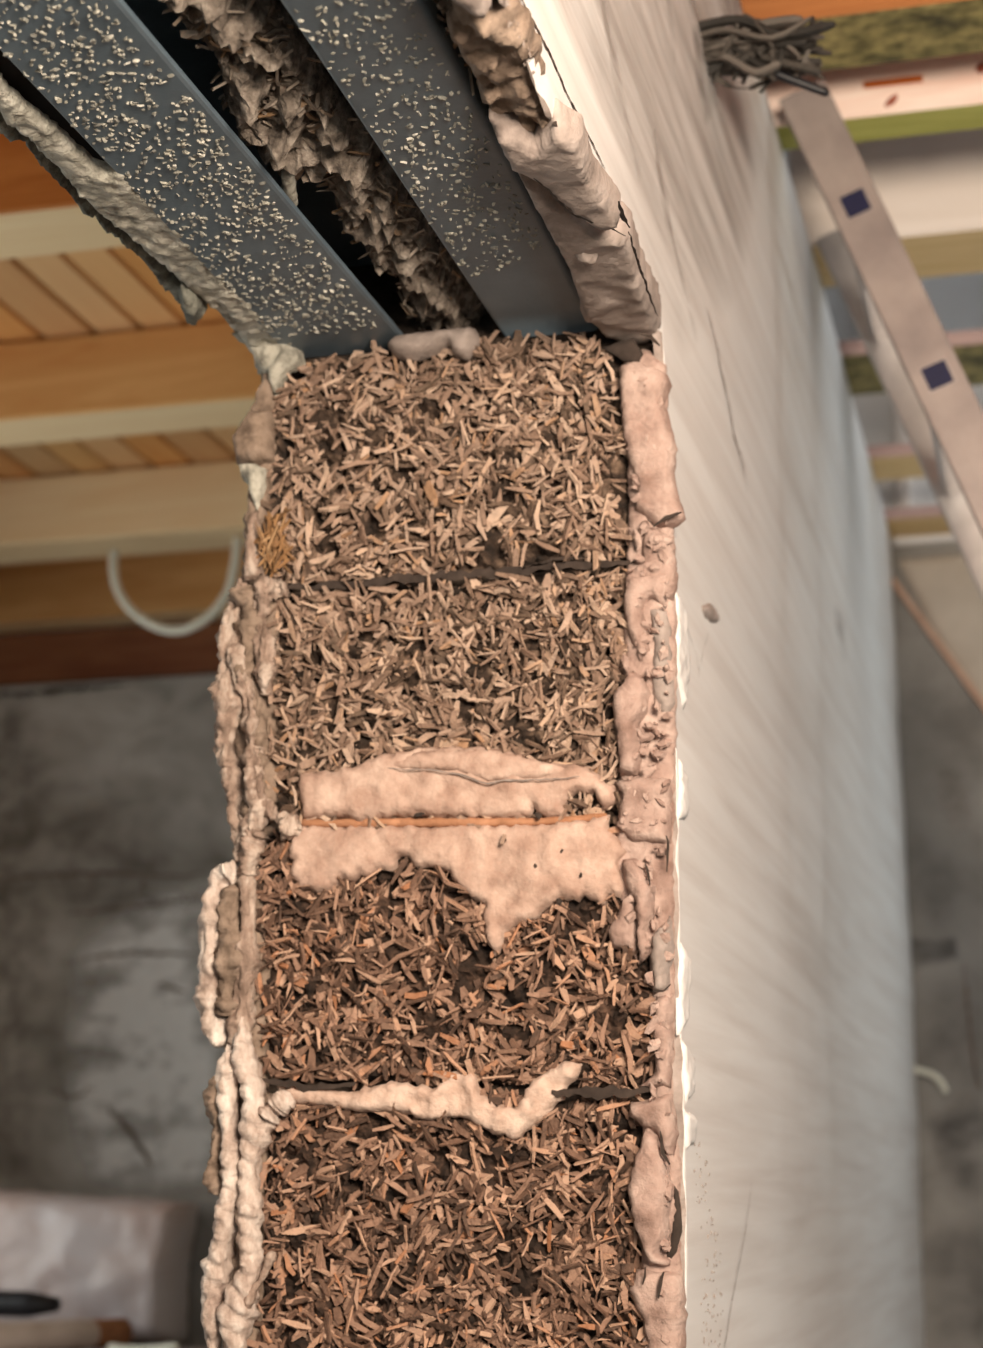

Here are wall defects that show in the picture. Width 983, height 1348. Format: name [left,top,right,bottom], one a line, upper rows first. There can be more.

peeling [446,0,621,231]
crack [708,313,746,476]